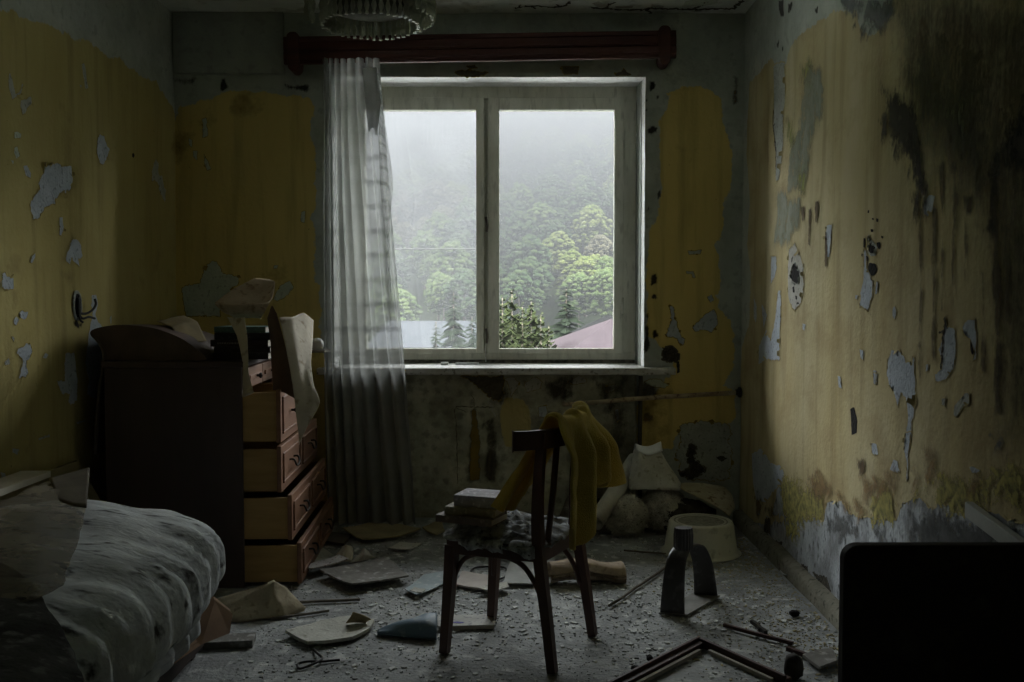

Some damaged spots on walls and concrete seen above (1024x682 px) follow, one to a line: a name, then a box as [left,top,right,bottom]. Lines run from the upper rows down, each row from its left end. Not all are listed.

peeling [11,131,75,220]
water stain [841,0,1024,418]
peeling [661,294,718,373]
peeling [753,242,804,365]
peeling [873,319,977,481]
water stain [827,512,859,544]
flaking render [750,448,998,600]
water stain [909,510,992,542]